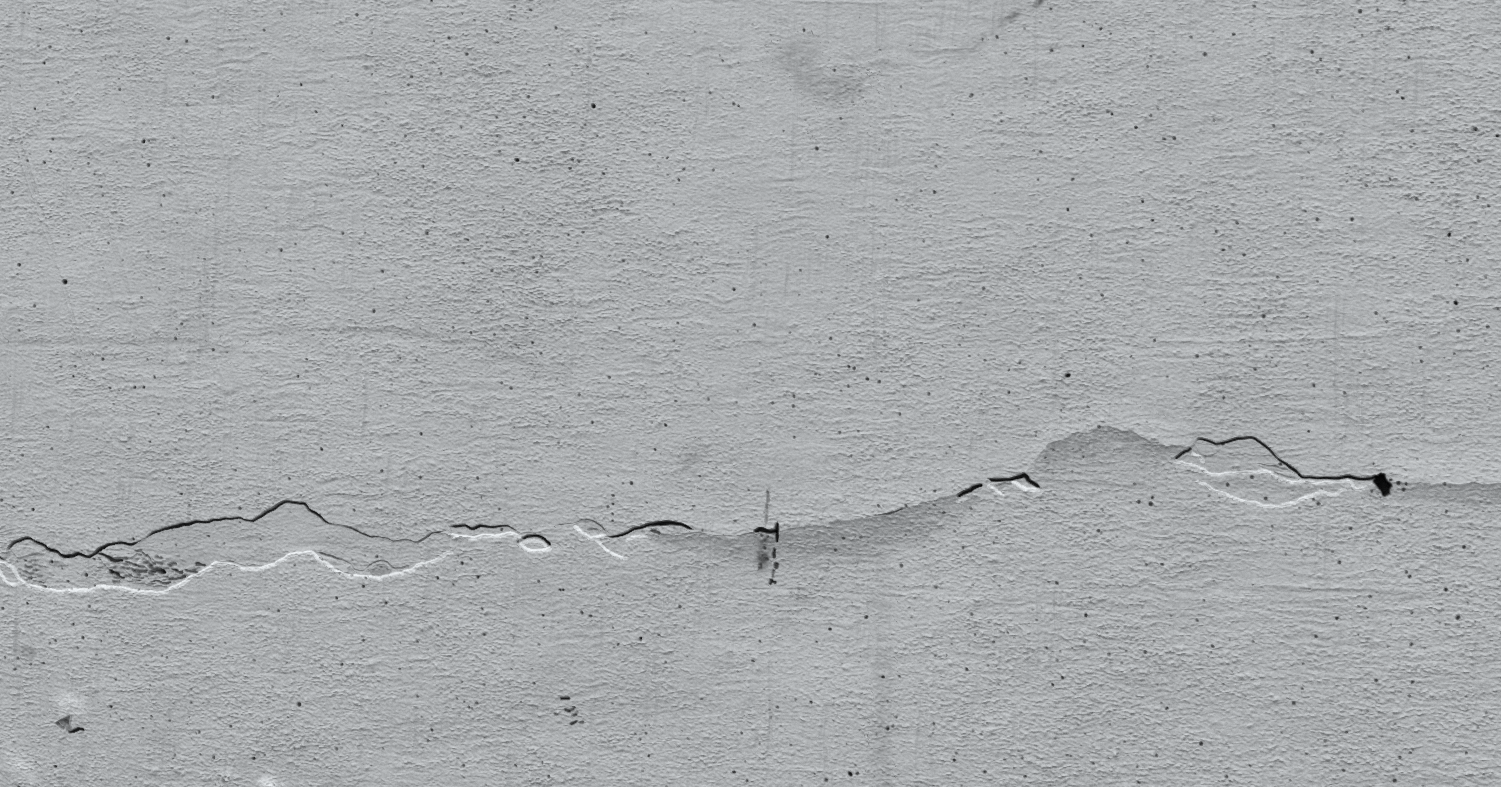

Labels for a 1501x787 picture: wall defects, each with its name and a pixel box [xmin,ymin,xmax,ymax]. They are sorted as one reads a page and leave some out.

crack [955,472,1154,503]
crack [604,520,754,542]